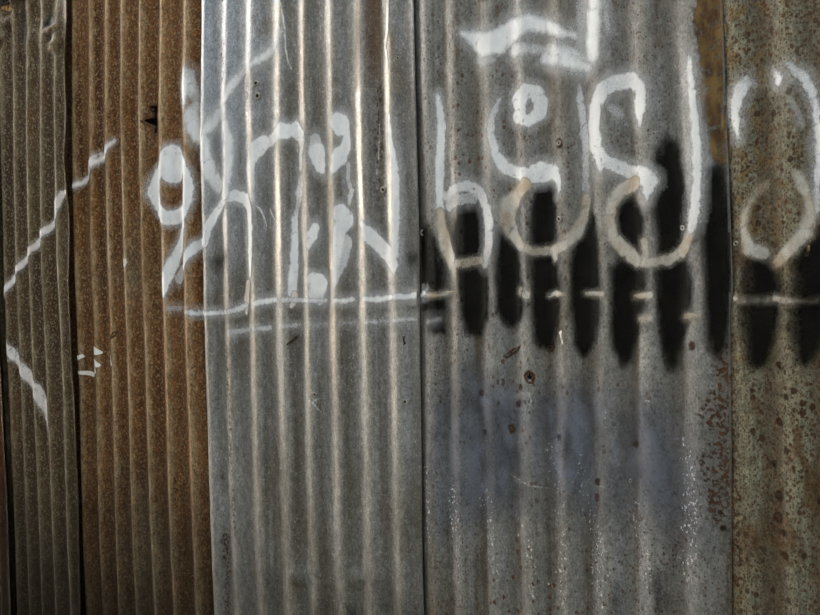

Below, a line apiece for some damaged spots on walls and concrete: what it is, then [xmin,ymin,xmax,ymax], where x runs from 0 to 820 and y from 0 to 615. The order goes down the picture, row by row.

corrosion [692,0,733,165]
corrosion [698,335,744,590]